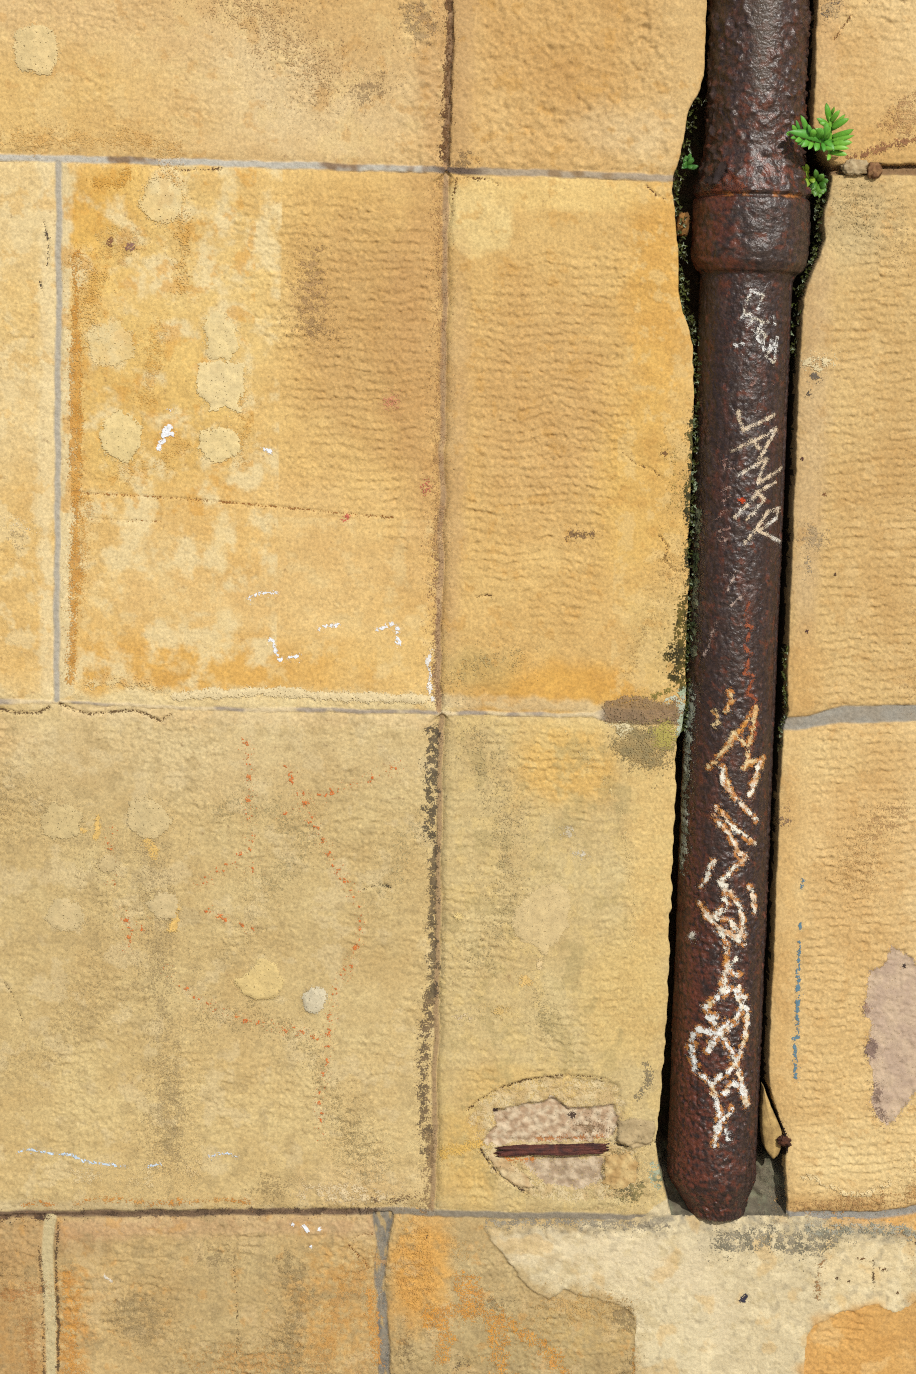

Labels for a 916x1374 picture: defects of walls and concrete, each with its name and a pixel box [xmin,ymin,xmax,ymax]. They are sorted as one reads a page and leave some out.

spalling [859,945,916,1130]
spalling [464,1072,658,1209]